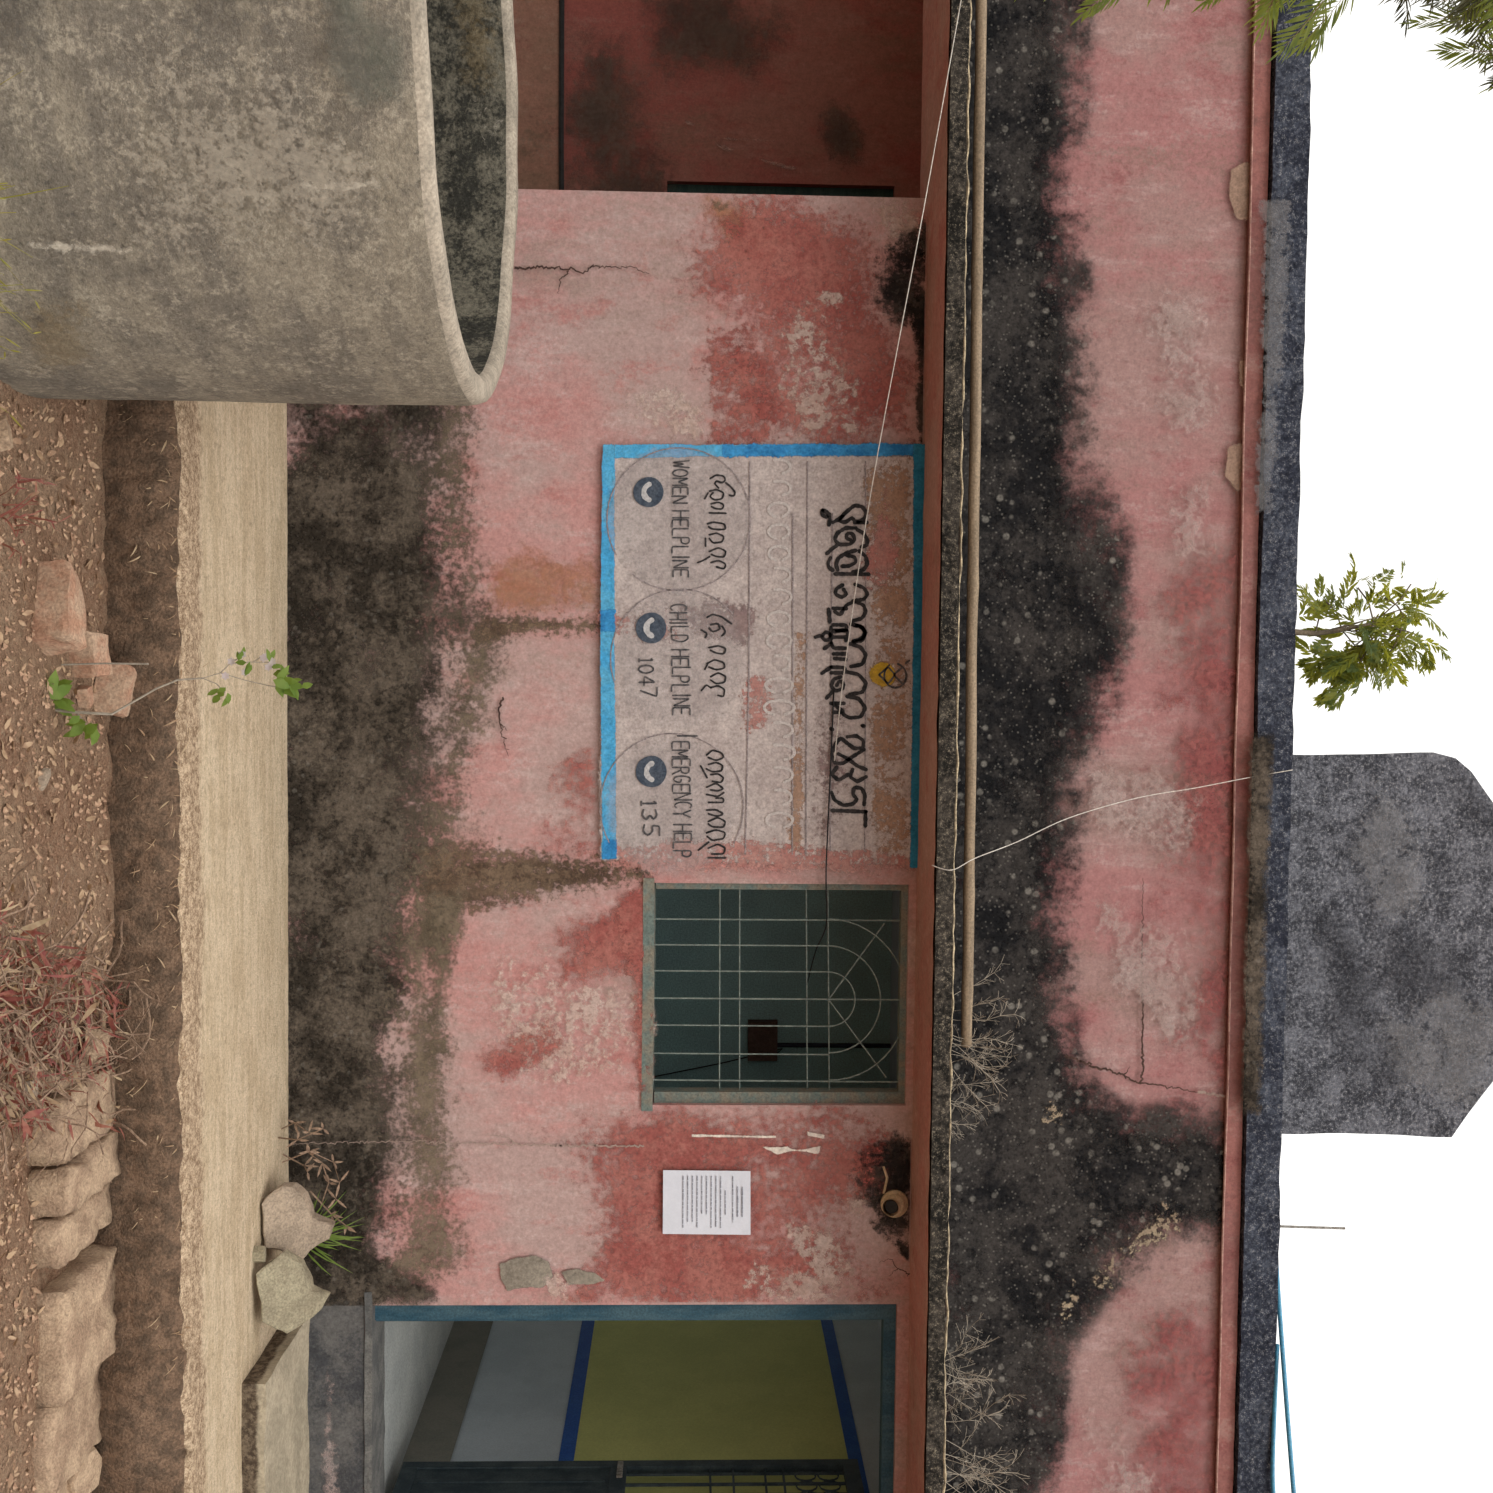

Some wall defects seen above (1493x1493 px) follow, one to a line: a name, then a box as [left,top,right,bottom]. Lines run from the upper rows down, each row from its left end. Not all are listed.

crack [514,264,649,293]
peeling [629,194,921,445]
leakage [943,0,1224,1493]
leakage [287,403,654,1493]
crack [1065,881,1244,1101]
peeling [499,1105,890,1303]